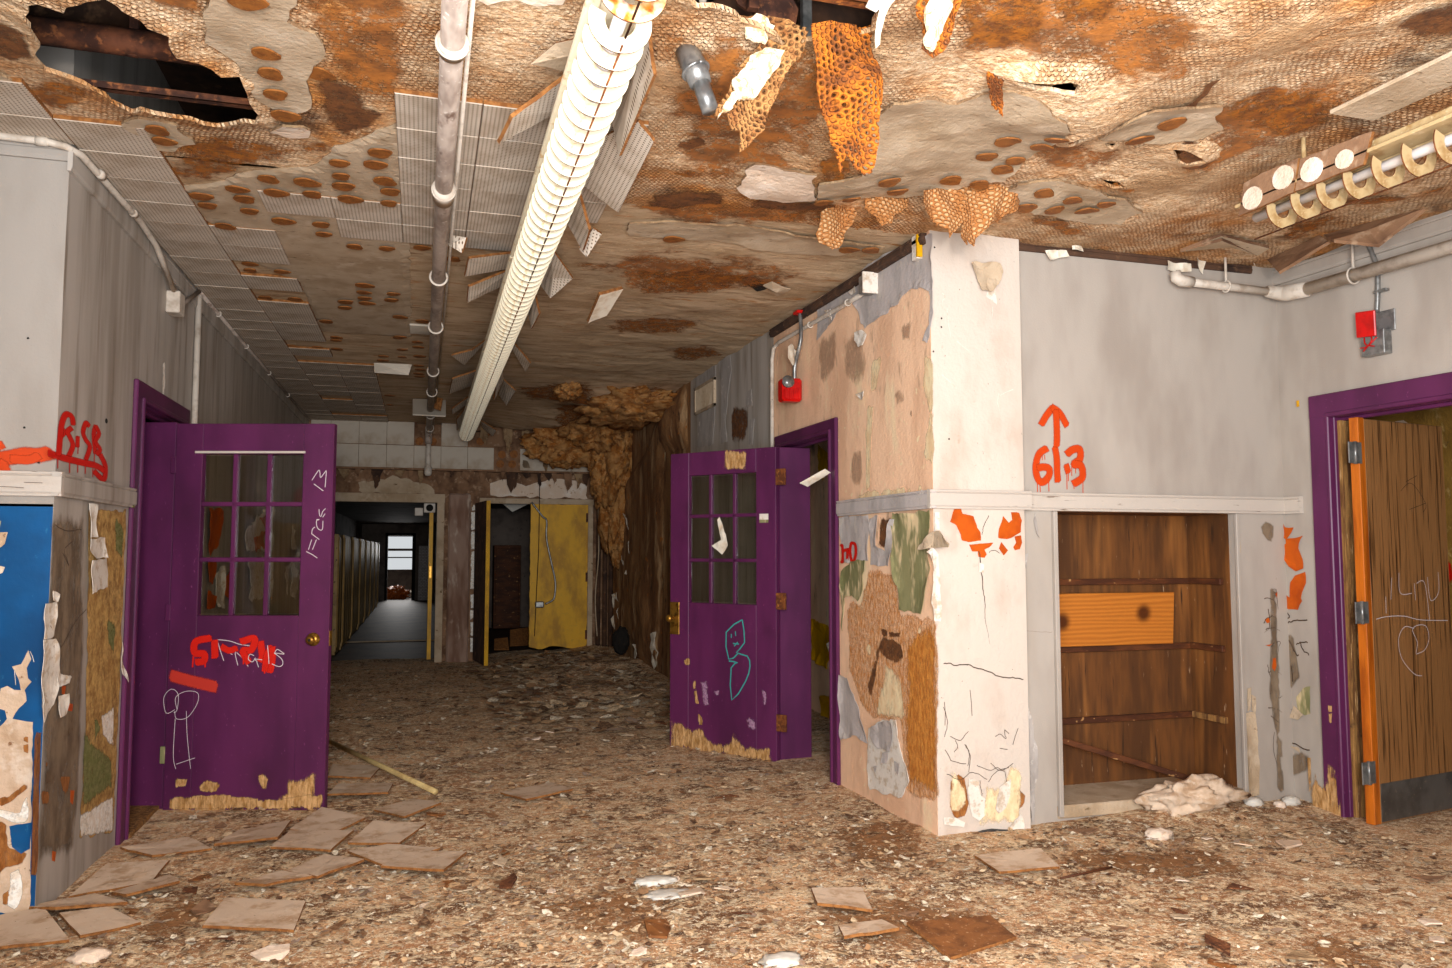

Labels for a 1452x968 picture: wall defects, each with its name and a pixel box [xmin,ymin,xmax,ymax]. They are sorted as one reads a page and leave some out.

peeling [817,445,828,480]
peeling [917,509,1039,622]
peeling [1275,524,1306,610]
spalling [0,503,129,915]
peeling [611,593,658,669]
peeling [811,515,909,798]
crack [943,515,1023,792]
spalling [944,705,1039,830]